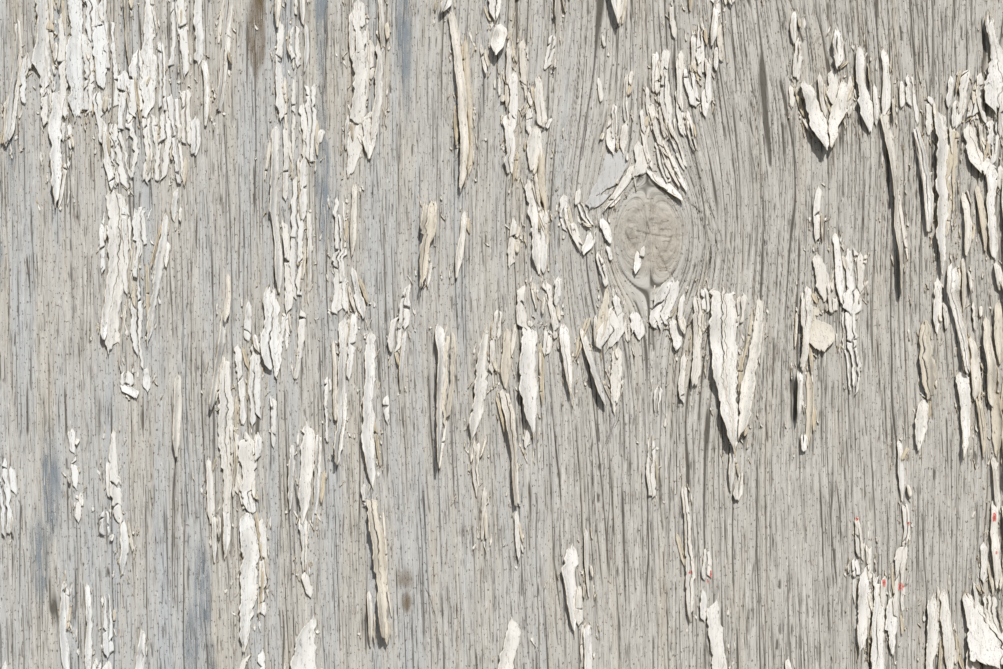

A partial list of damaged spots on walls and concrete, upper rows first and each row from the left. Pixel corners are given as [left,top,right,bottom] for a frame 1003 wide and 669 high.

peeling [0,0,242,458]
peeling [193,0,471,669]
peeling [433,0,769,570]
peeling [785,7,1003,669]
peeling [0,457,18,544]
peeling [59,570,117,669]
peeling [62,423,139,583]
peeling [135,629,148,669]
peeling [492,617,536,669]
peeling [544,528,600,669]
peeling [676,473,736,669]